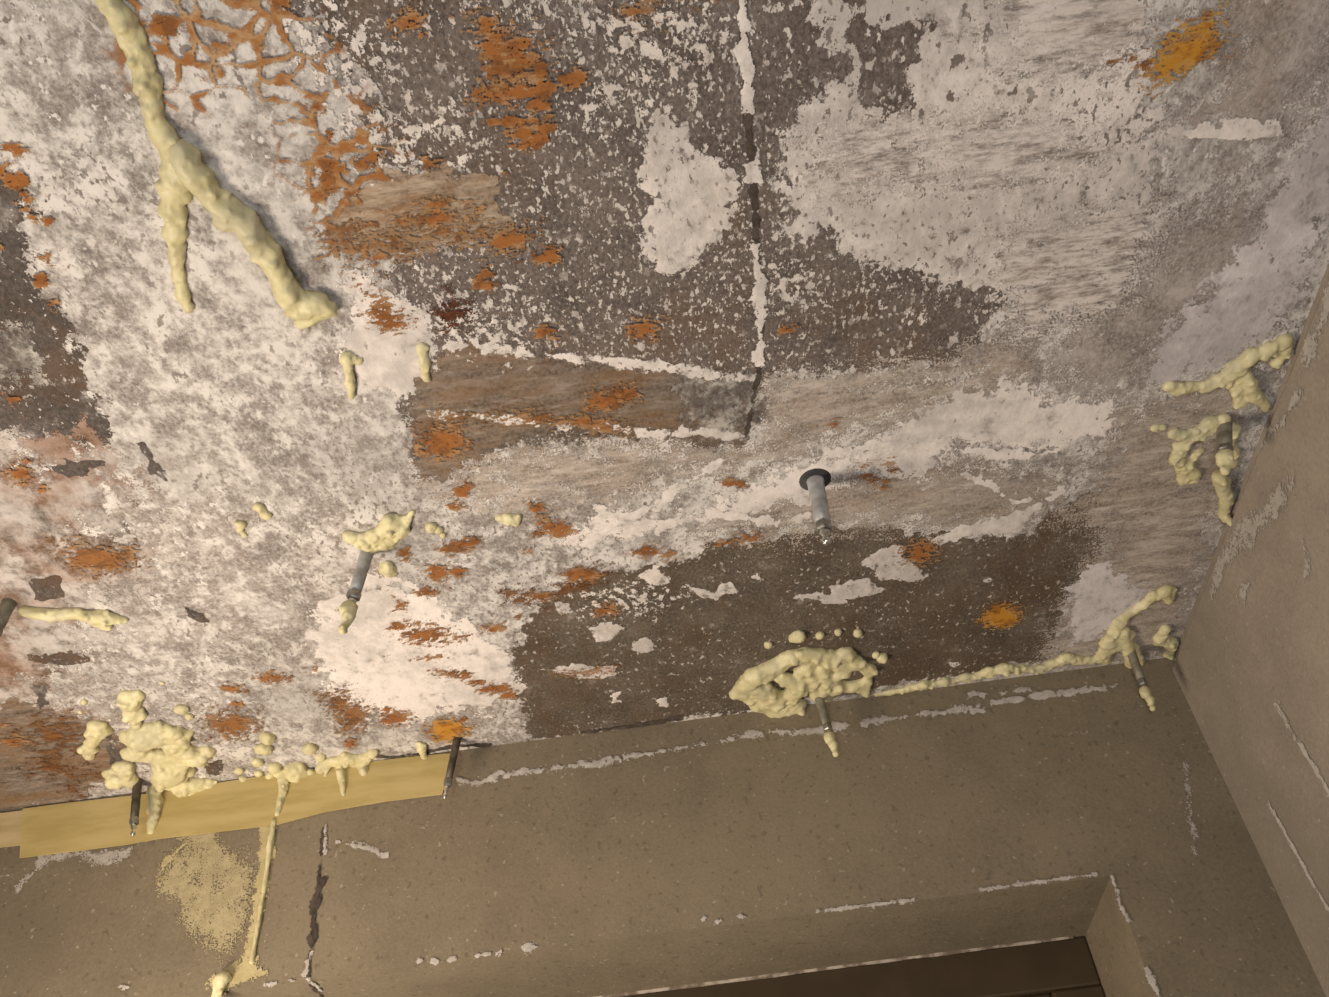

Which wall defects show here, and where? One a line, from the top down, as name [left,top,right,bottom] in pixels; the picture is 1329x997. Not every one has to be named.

corrosion [110,37,126,70]
corrosion [1106,0,1243,99]
corrosion [0,139,54,227]
corrosion [128,0,591,337]
crack [732,0,769,436]
corrosion [29,249,70,312]
spalling [241,0,1329,741]
corrosion [400,379,651,511]
corrosion [29,528,152,584]
corrosion [0,700,119,802]
water stain [916,683,1118,717]
crack [300,824,328,997]